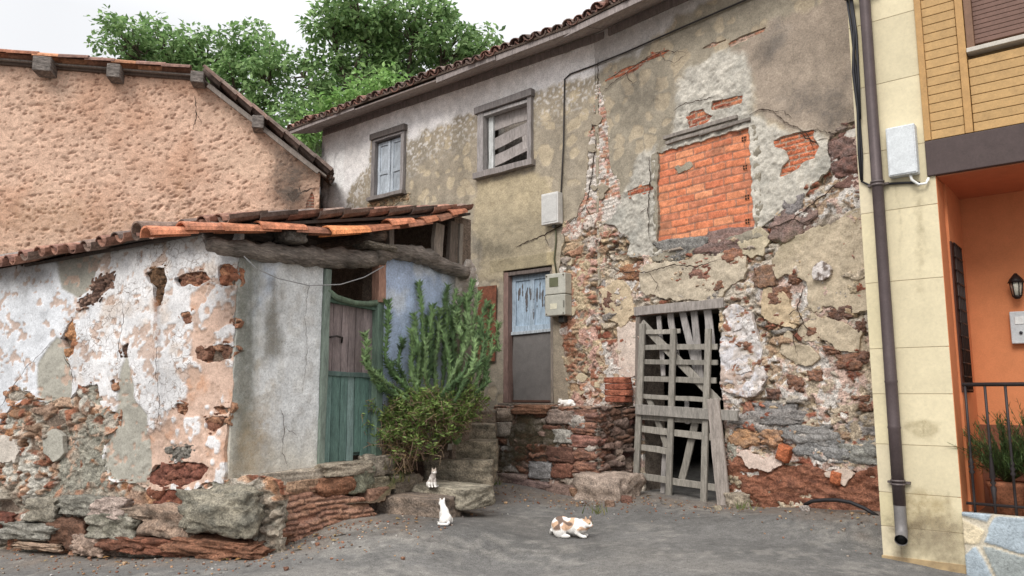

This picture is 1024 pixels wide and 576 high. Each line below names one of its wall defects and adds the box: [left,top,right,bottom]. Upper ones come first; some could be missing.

flaking render [686,96,743,128]
crack [515,51,687,247]
flaking render [568,48,669,231]
flaking render [774,130,819,176]
spalling [148,264,246,306]
spalling [60,267,116,361]
spalling [178,308,194,324]
crack [789,289,812,356]
spalling [195,341,244,363]
spalling [3,385,36,406]
spalling [203,402,239,435]
spalling [146,444,209,504]